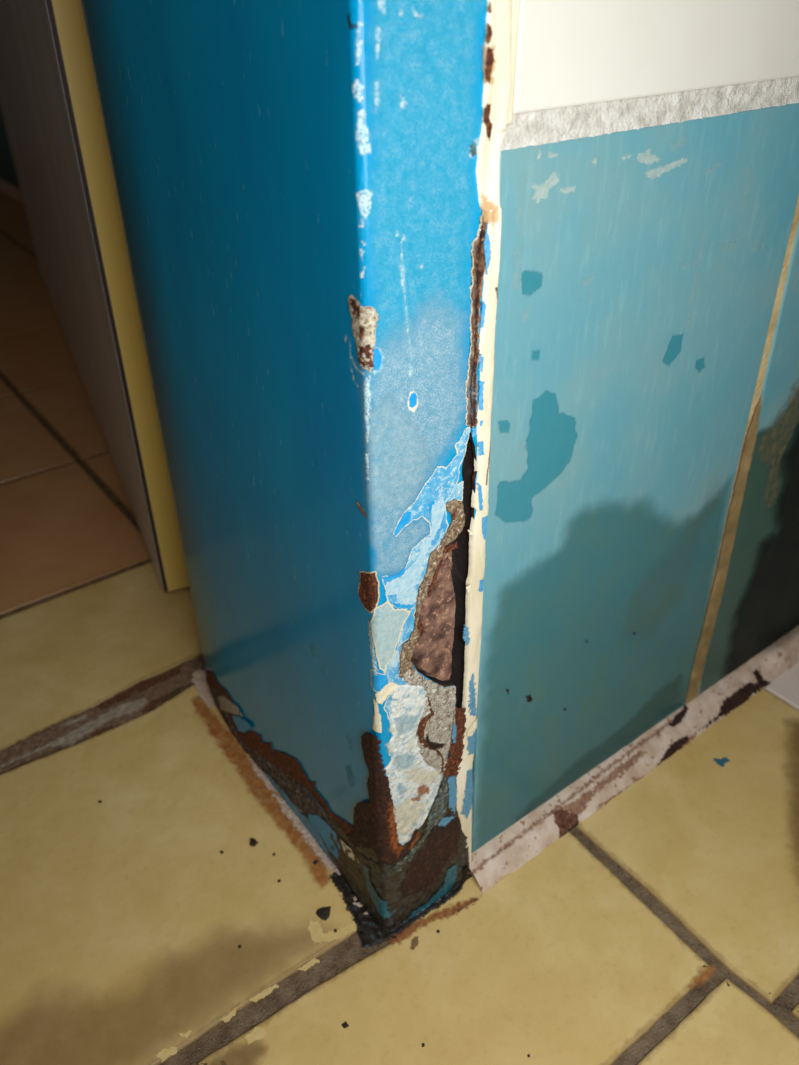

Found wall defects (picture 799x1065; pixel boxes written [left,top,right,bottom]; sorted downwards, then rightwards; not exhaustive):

peeling [347,14,363,66]
peeling [352,79,379,154]
peeling [356,189,372,227]
rust [345,295,384,387]
peeling [356,375,478,758]
rust [427,542,458,597]
water stain [472,391,799,873]
rust [194,669,478,945]